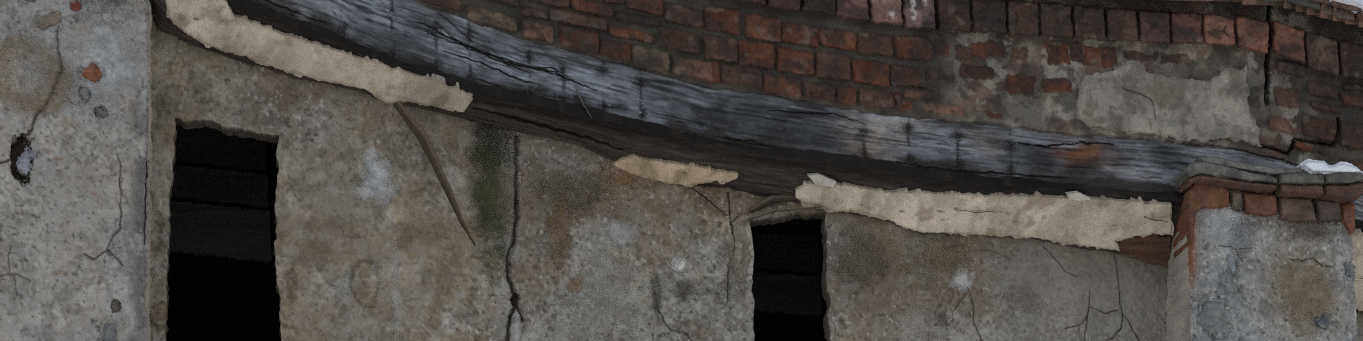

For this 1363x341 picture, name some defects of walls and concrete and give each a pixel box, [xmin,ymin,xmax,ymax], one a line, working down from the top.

crack [0,25,63,164]
crack [1264,5,1273,103]
flaking render [10,134,37,187]
crack [0,245,30,297]
crack [84,154,148,266]
crack [506,136,522,341]
crack [1043,246,1139,341]
flaking render [1116,233,1171,267]